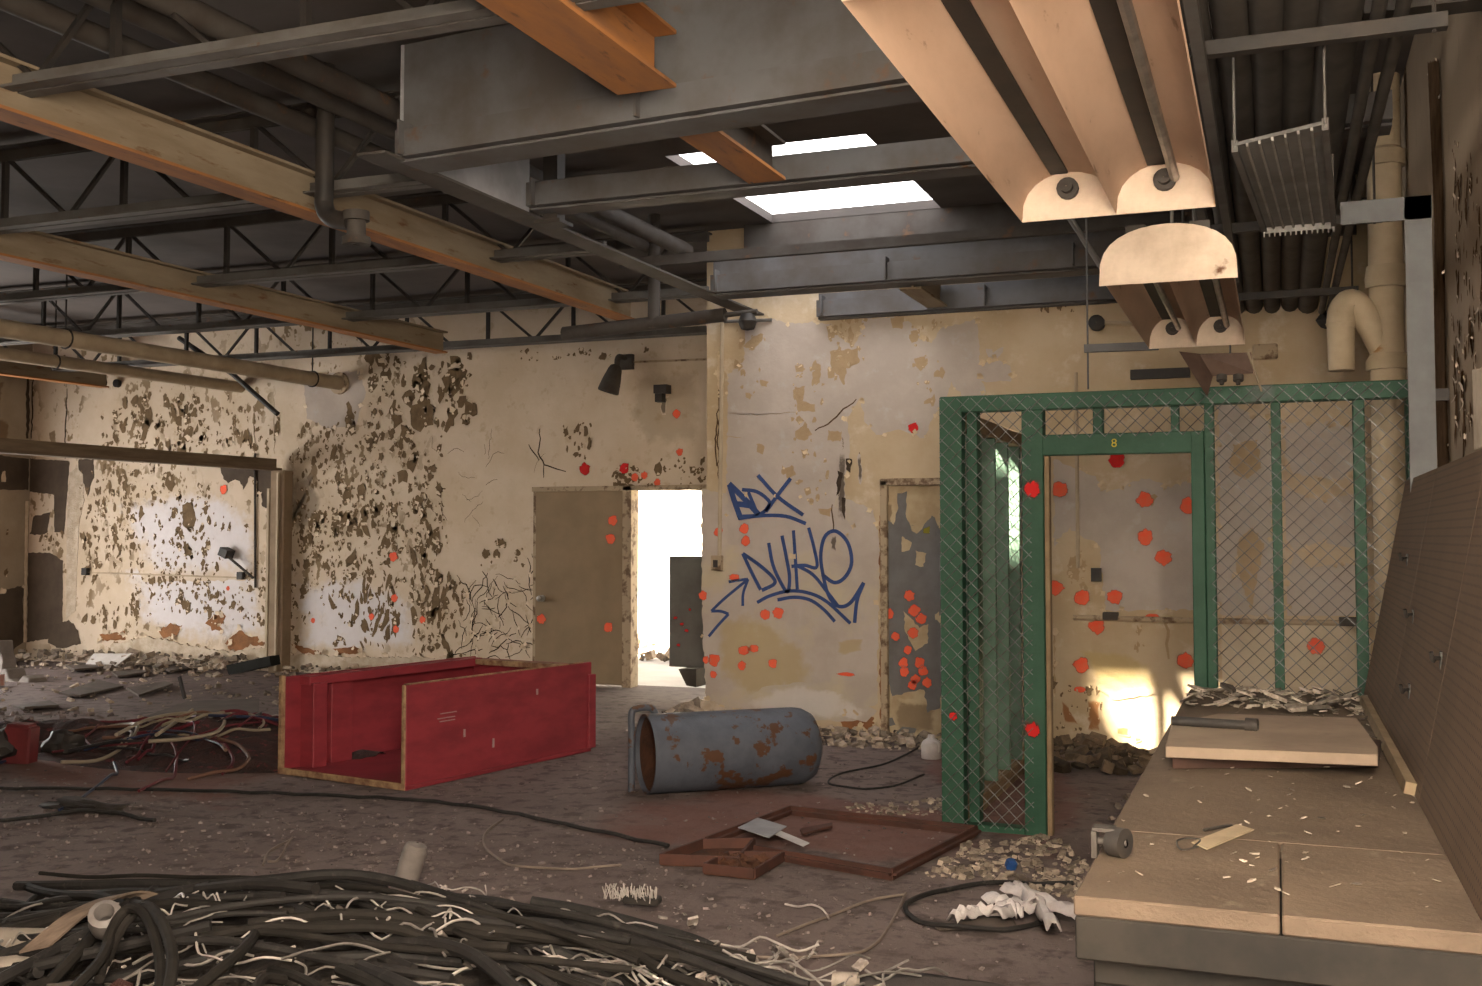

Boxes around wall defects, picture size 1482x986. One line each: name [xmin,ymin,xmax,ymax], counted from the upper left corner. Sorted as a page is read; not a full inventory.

flaking render [0,352,477,671]
peeling [480,538,525,567]
peeling [520,347,611,361]
peeling [612,315,986,735]
flaking render [1427,58,1482,468]